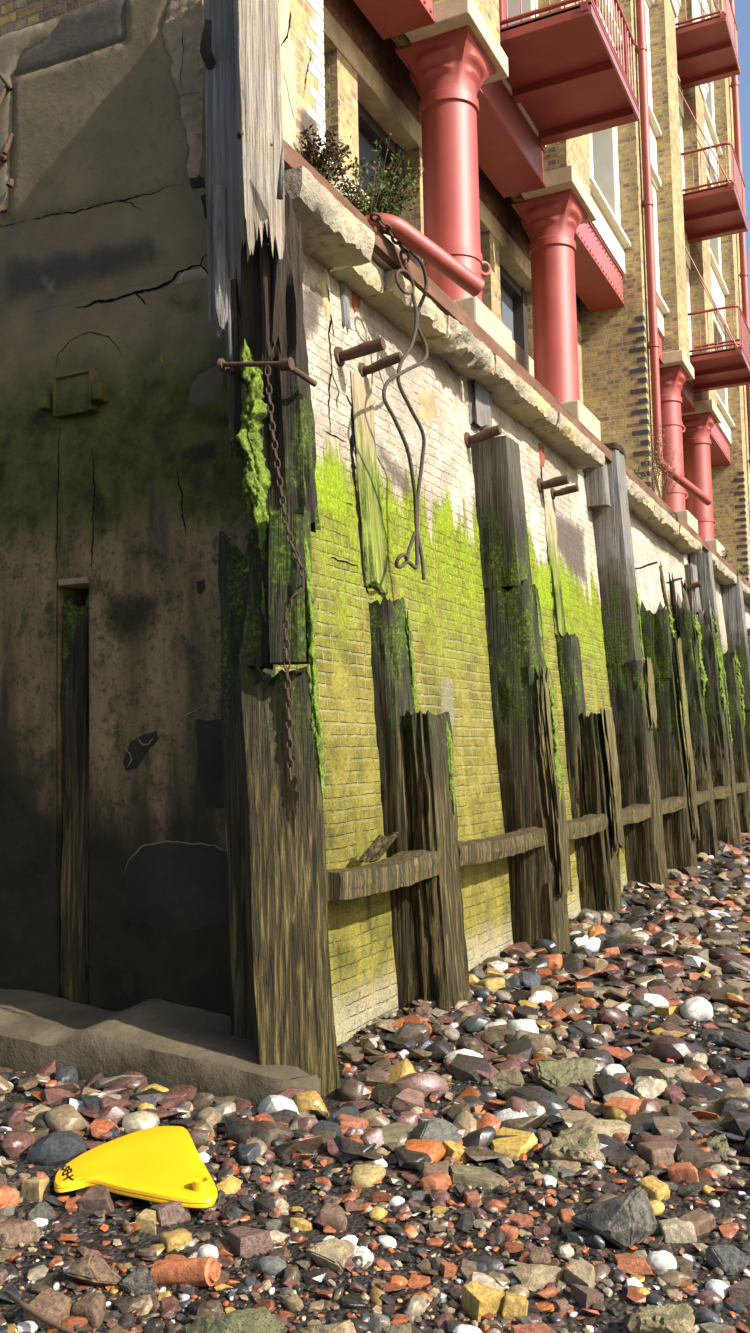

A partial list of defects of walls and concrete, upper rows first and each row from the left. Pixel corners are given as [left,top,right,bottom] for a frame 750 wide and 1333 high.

crack [6,187,165,226]
crack [54,254,208,373]